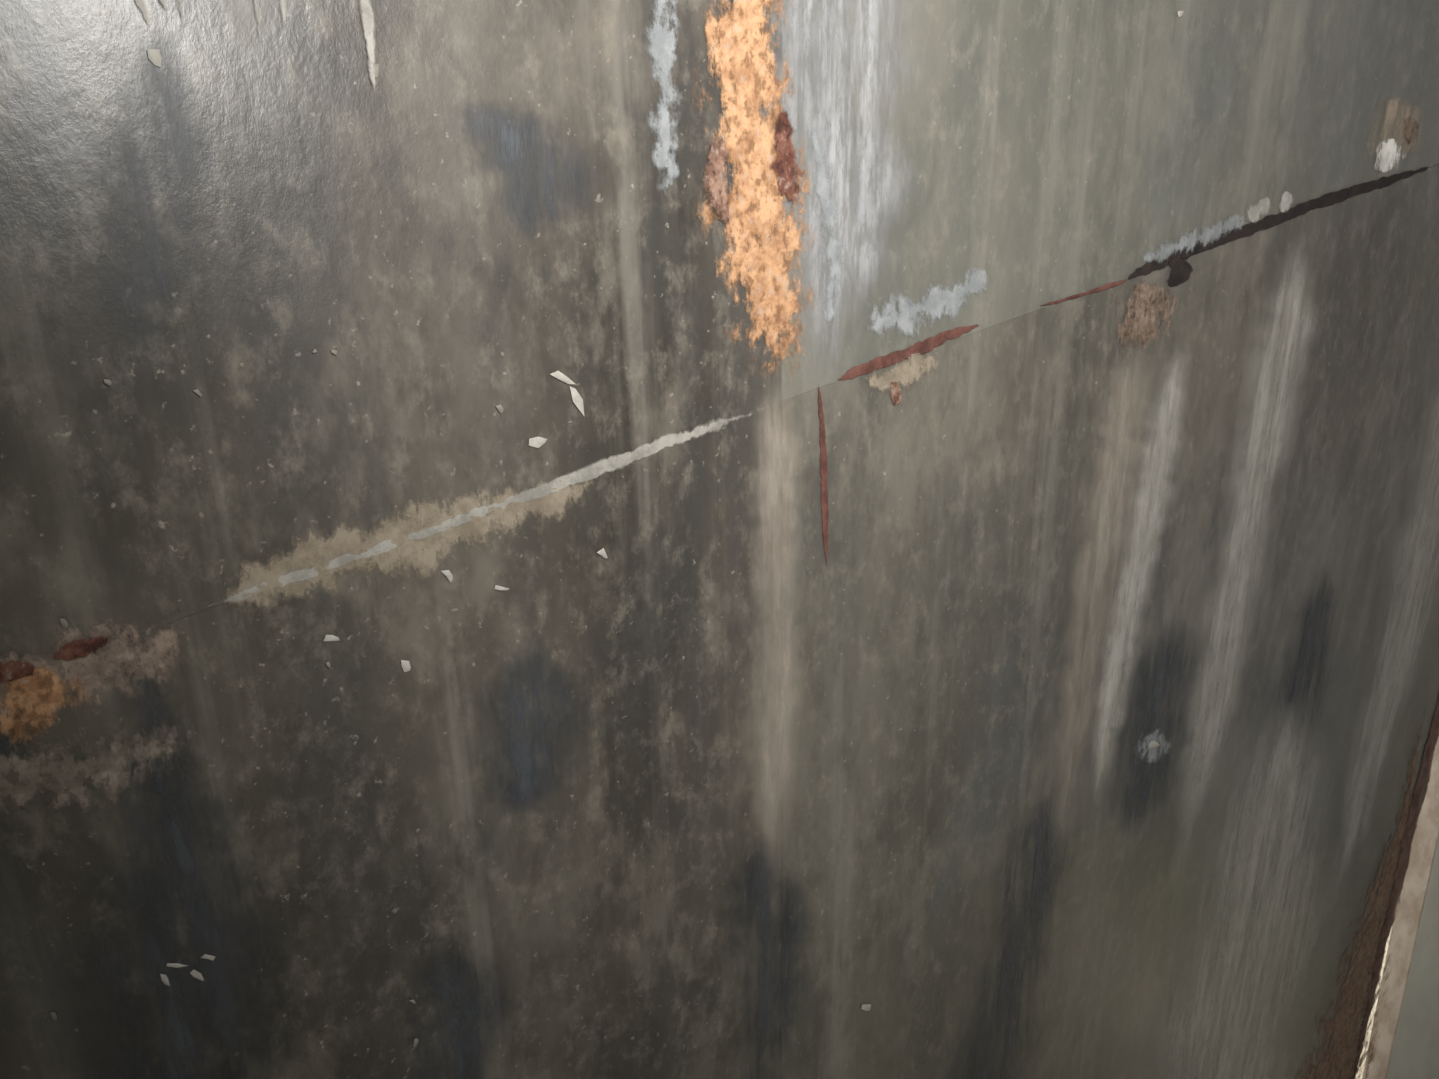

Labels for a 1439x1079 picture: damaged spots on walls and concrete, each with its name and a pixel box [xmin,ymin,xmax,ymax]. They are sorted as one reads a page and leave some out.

corrosion [702,0,812,369]
corrosion [762,415,792,802]
crack [818,269,986,564]
corrosion [1068,371,1137,774]
corrosion [1117,257,1193,347]
crack [1041,164,1438,306]